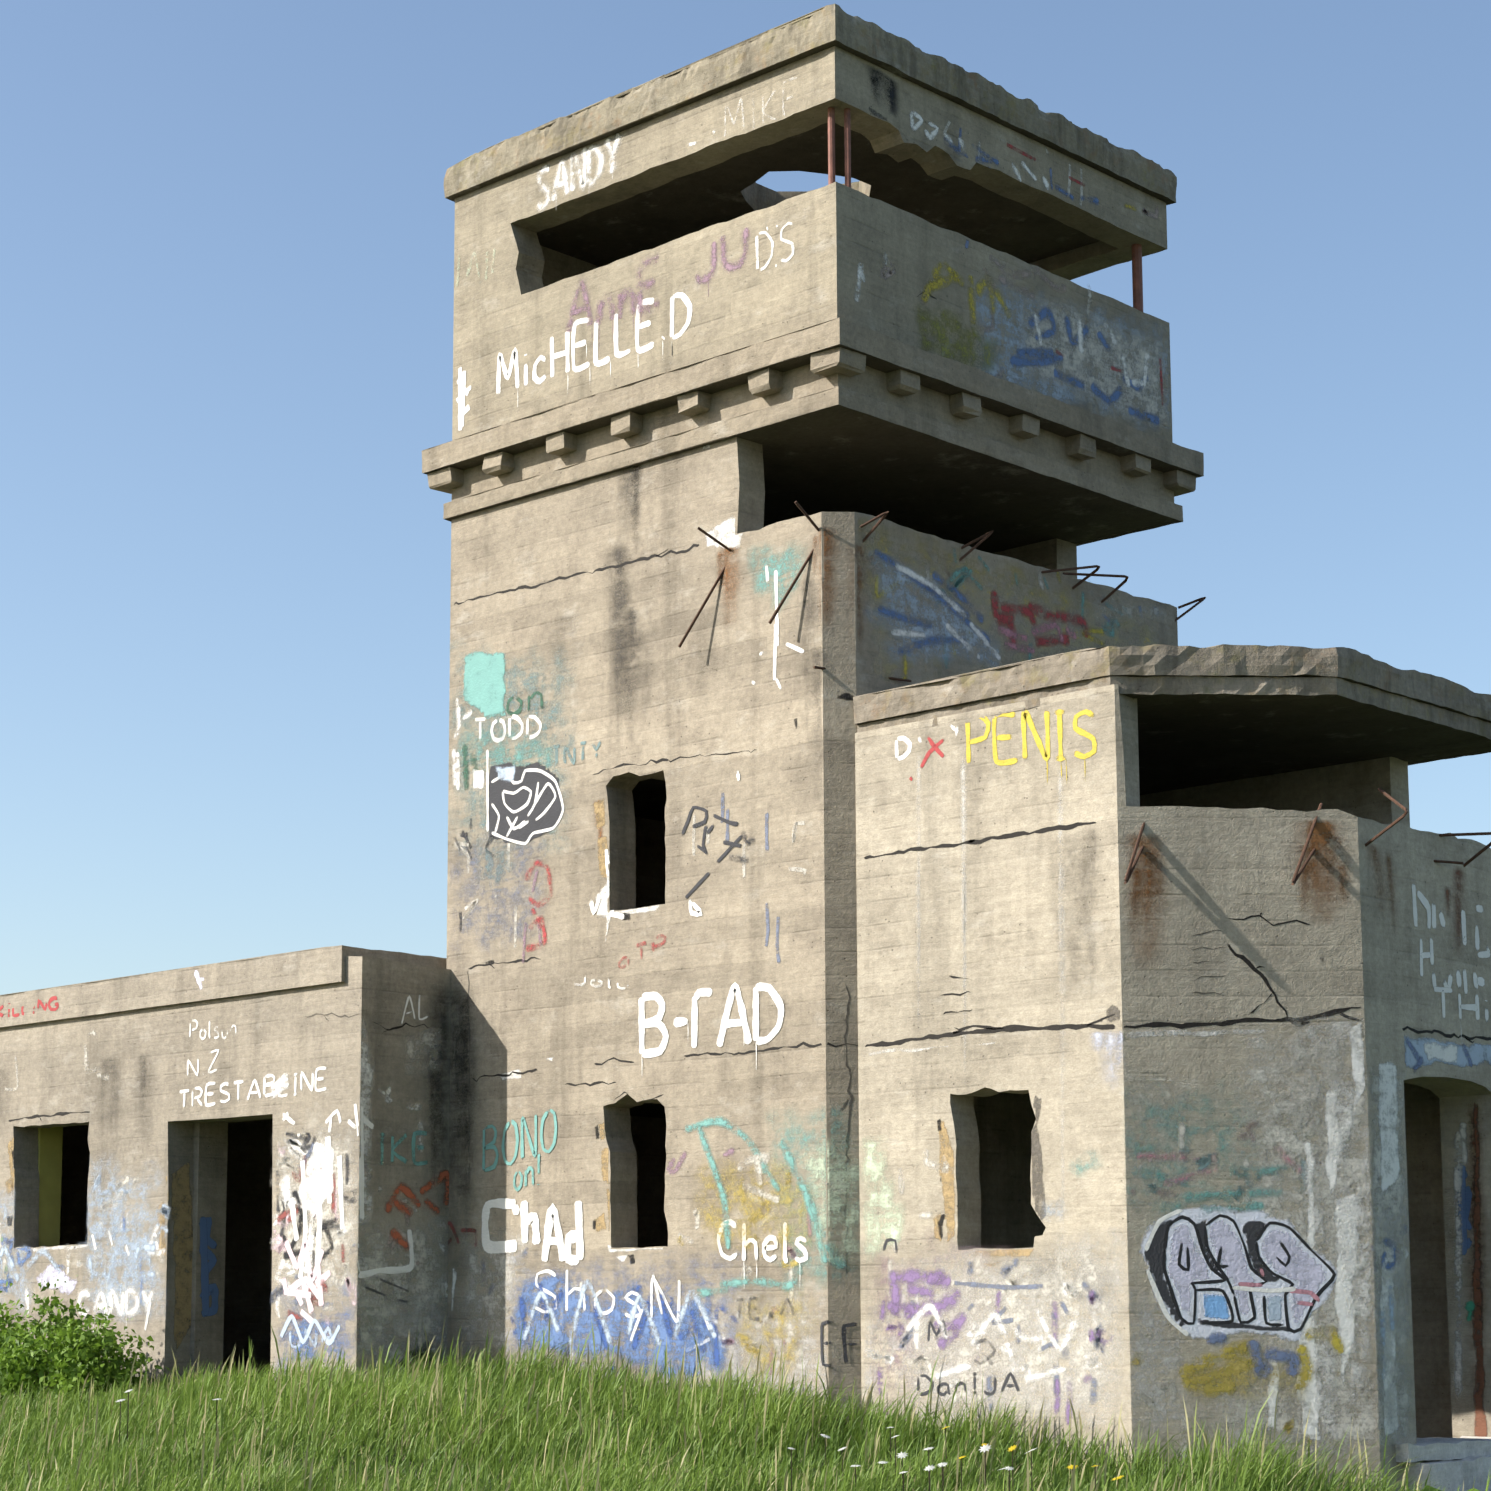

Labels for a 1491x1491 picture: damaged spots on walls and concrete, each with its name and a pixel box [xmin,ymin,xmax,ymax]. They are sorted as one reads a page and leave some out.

crack [454,544,699,605]
rust [820,530,832,589]
crack [864,822,1096,859]
rust [1302,821,1346,896]
rust [1446,870,1462,935]
crack [1403,1026,1491,1043]
crack [465,957,663,1183]
crack [684,912,1361,1273]